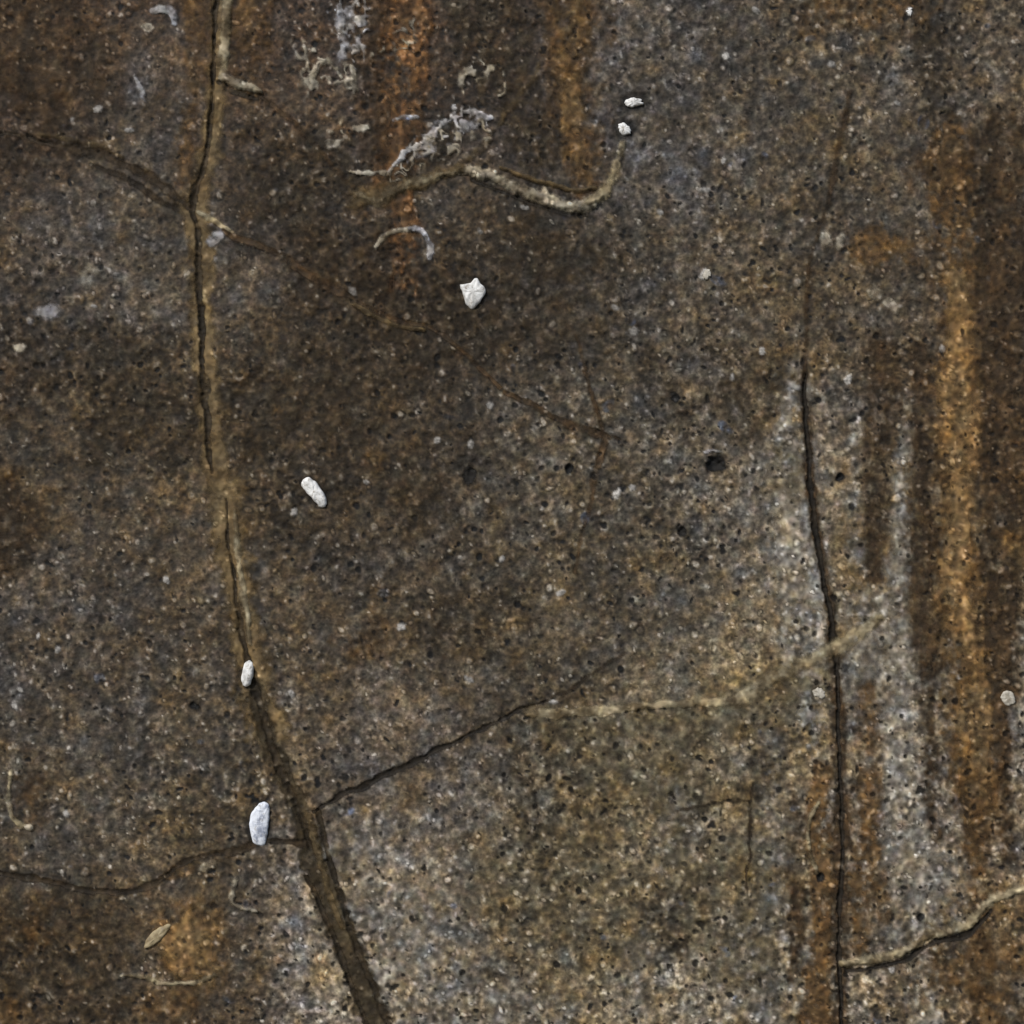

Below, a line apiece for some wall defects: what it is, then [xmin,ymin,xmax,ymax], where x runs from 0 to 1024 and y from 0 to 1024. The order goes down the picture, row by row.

crack [0,0,625,1024]
rust [547,0,599,197]
crack [800,90,1024,1024]
rust [905,108,1024,1024]